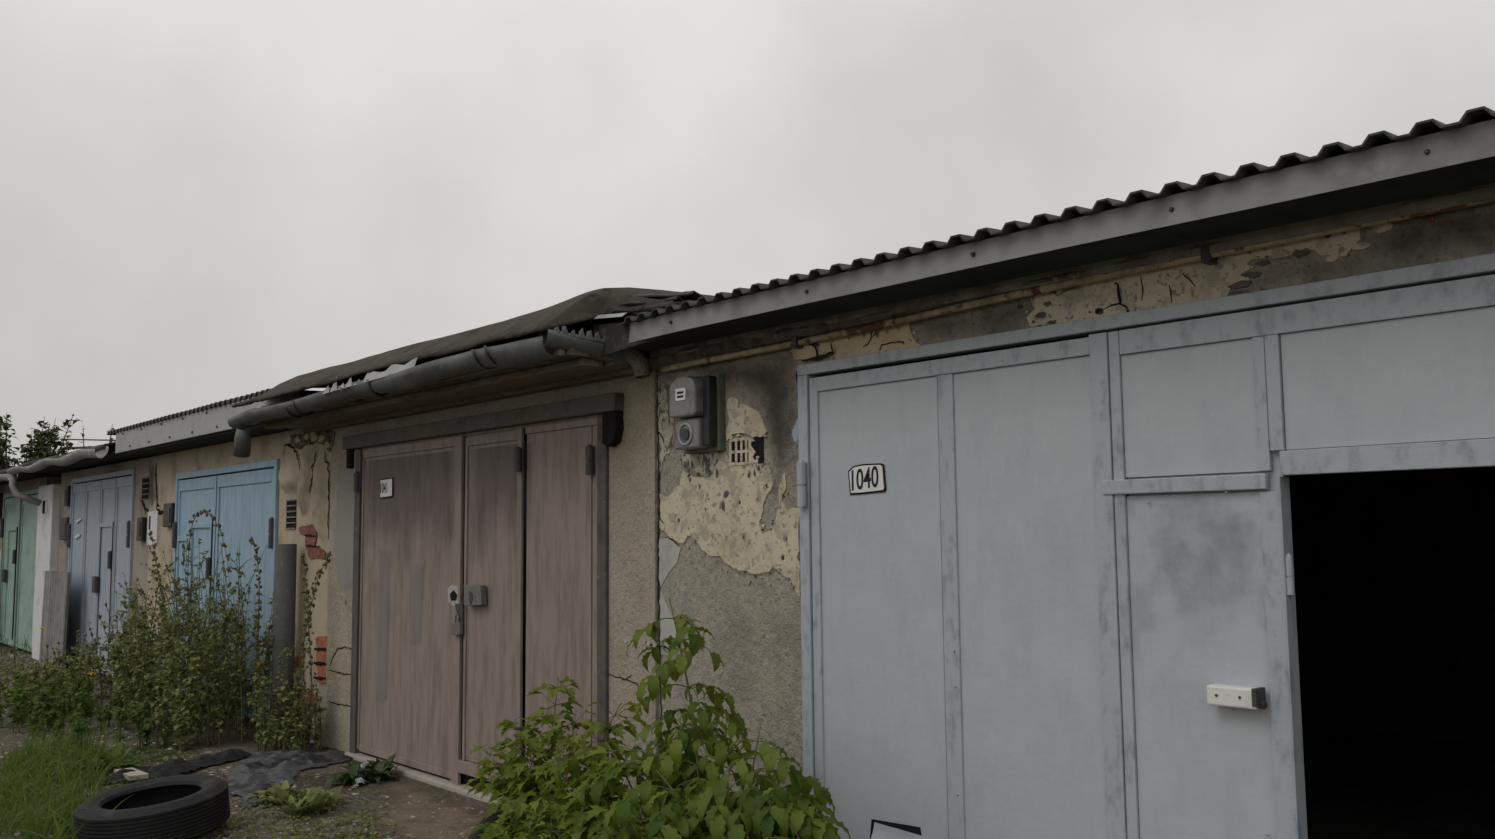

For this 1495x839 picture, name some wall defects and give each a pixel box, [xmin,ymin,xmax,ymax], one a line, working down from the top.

peeling [1017,222,1393,327]
water stain [735,369,789,451]
crack [283,443,330,540]
flaking render [299,524,327,559]
peeling [657,378,801,655]